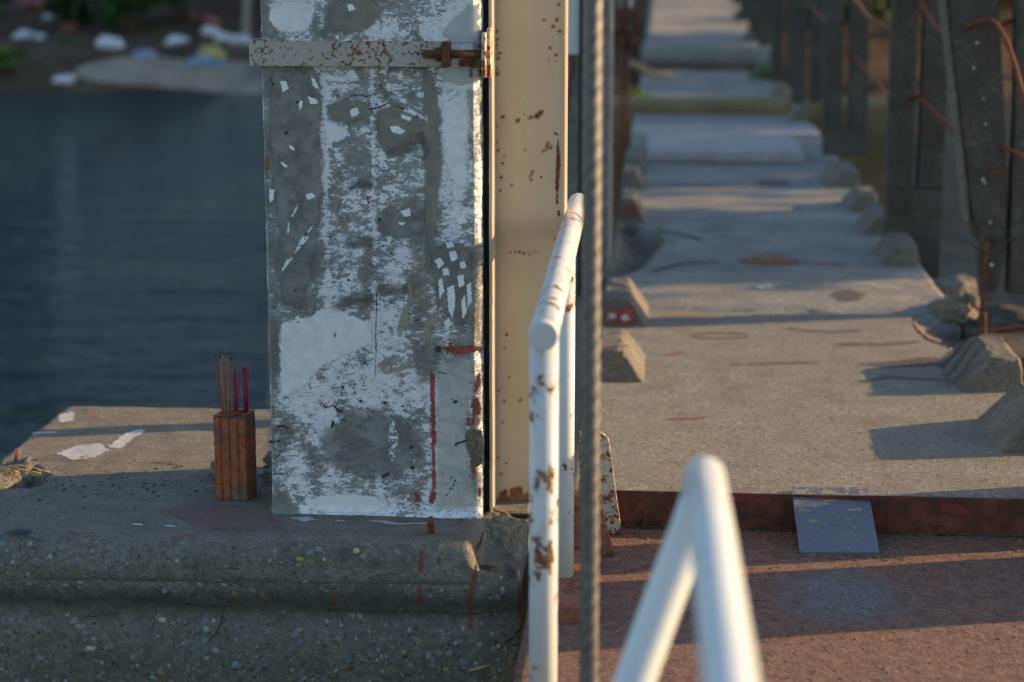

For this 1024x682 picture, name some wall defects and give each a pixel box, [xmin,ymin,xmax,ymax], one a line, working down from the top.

rust [459,58,478,76]
peeling [265,69,479,329]
rust [545,132,561,216]
spalling [455,418,482,475]
peeling [271,499,317,514]
rust [499,487,529,501]